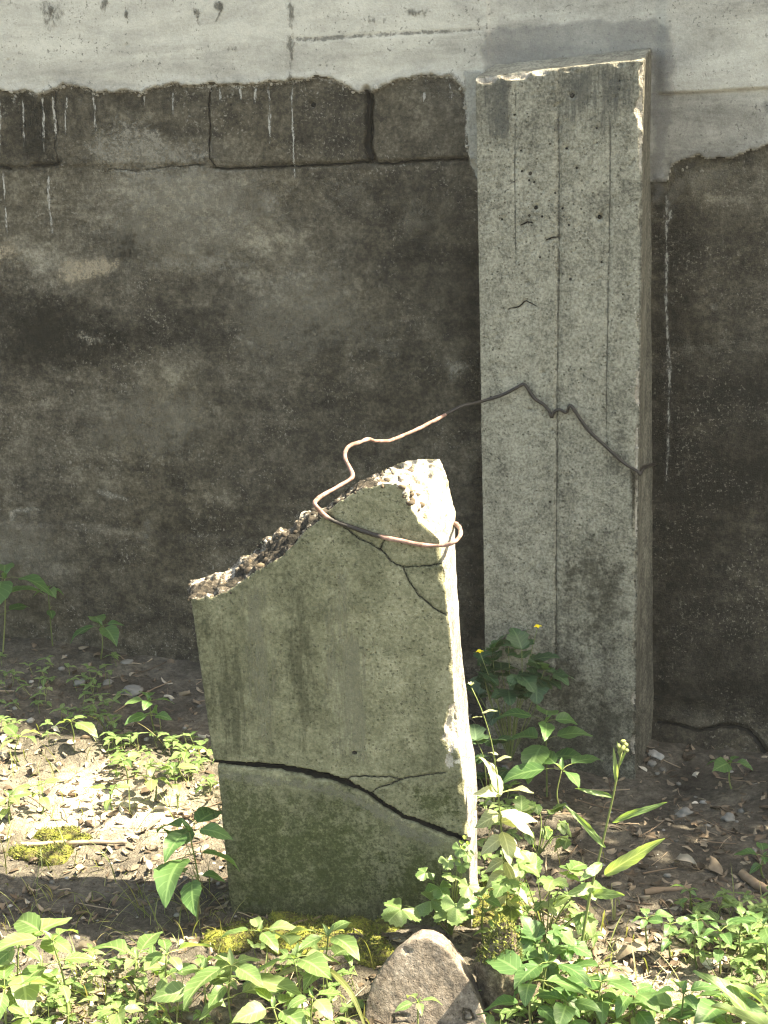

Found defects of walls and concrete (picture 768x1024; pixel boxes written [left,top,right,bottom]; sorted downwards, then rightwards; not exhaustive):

water stain [15,96,68,160]
water stain [88,92,210,188]
water stain [652,183,672,525]
spalling [187,459,456,601]
crack [325,511,447,615]
crack [657,721,767,754]
crack [213,760,471,842]